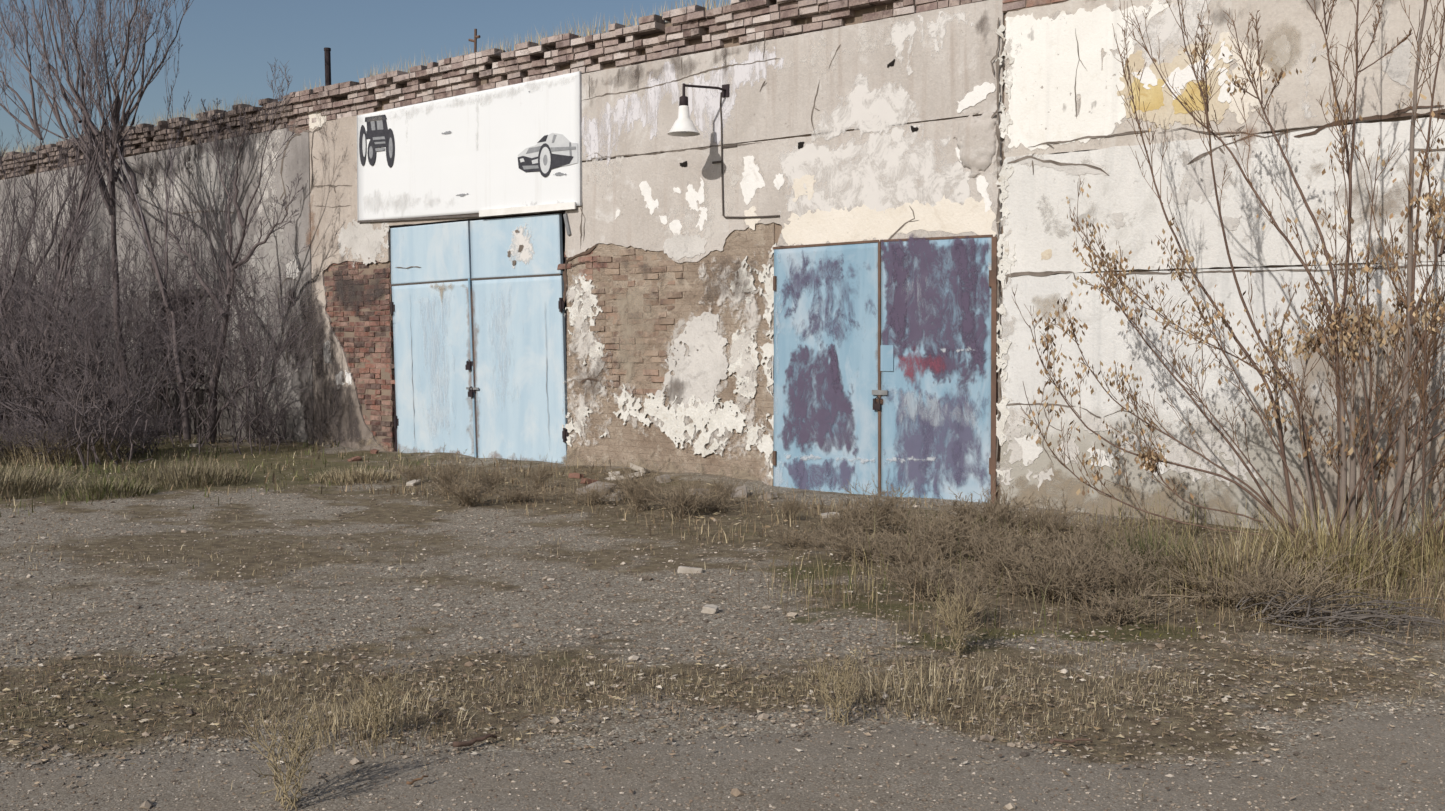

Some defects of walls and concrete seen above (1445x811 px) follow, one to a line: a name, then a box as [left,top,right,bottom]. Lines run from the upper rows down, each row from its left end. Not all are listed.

spalling [323,219,395,452]
peeling [508,226,534,268]
spalling [557,0,1293,498]
crack [991,17,1445,478]